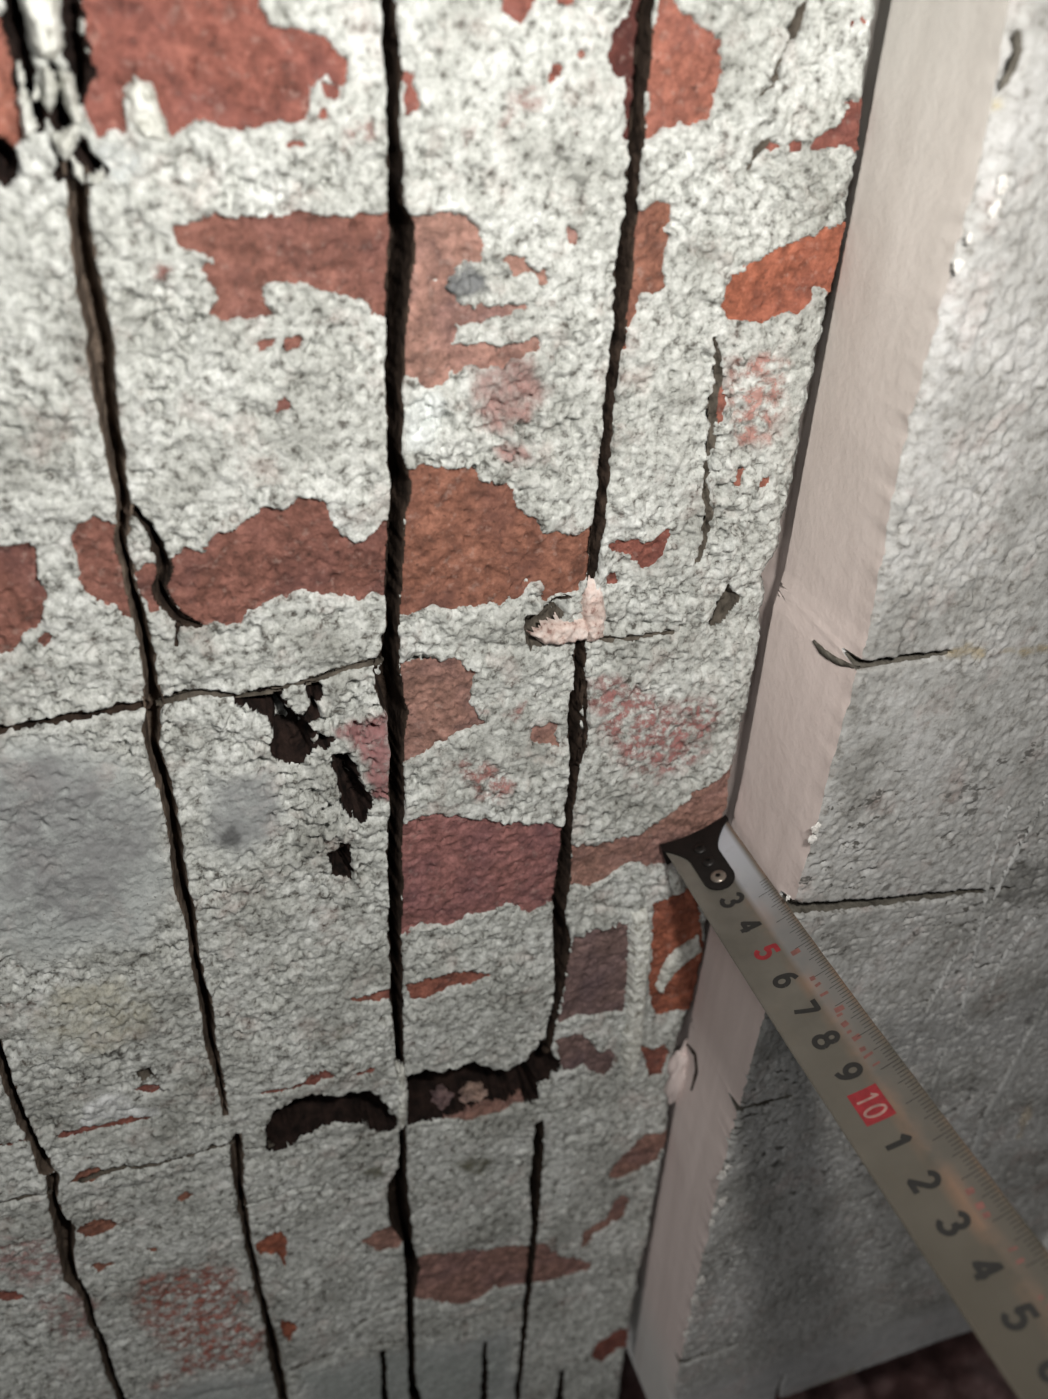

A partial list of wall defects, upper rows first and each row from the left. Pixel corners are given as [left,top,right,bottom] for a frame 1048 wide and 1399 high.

spalling [0,0,348,188]
spalling [173,210,390,321]
crack [124,504,203,647]
crack [0,655,384,734]
hole [232,681,374,824]
spalling [71,462,590,651]
crack [599,629,674,643]
crack [812,640,949,670]
spalling [401,765,732,935]
crack [783,886,1011,913]
spalling [261,922,629,1152]
crack [0,1137,275,1203]